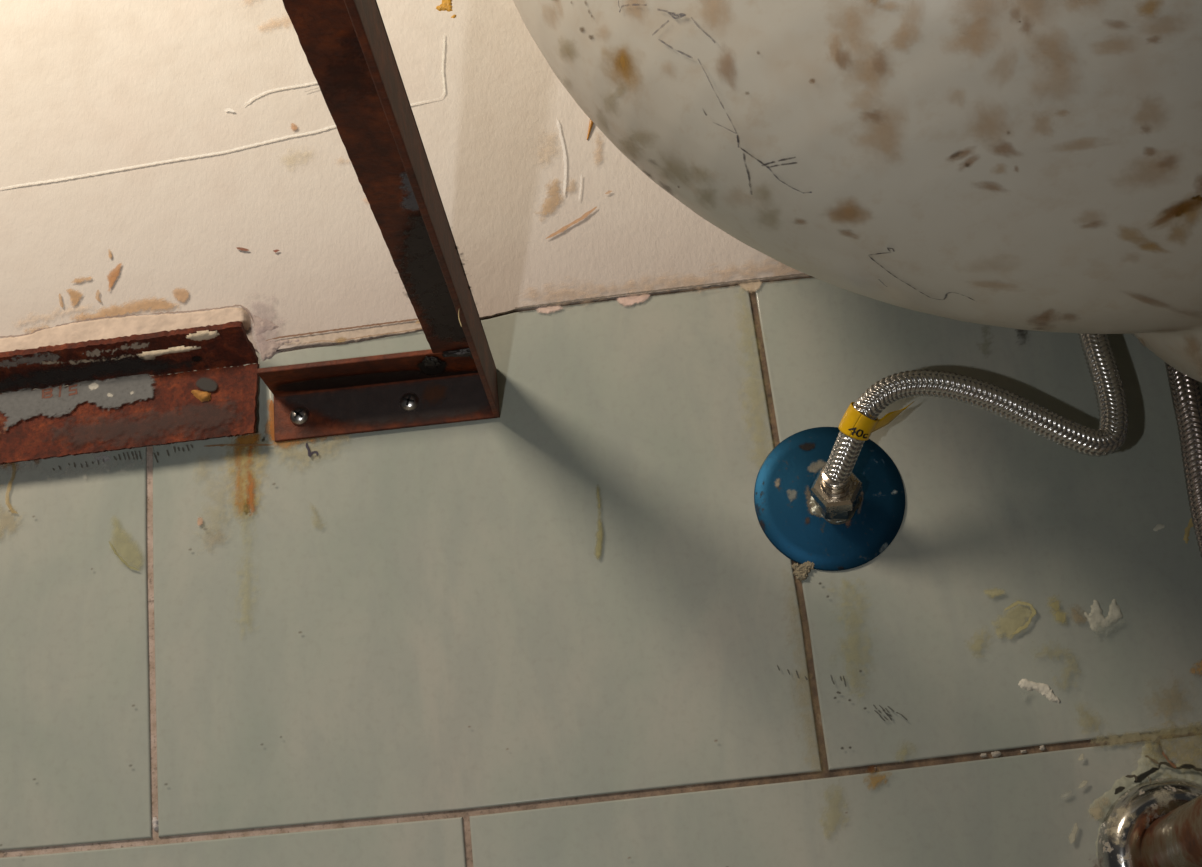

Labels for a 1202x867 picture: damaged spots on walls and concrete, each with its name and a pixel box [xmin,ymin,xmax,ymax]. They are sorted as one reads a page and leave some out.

corrosion [206,400,322,512]
crack [1114,752,1202,795]